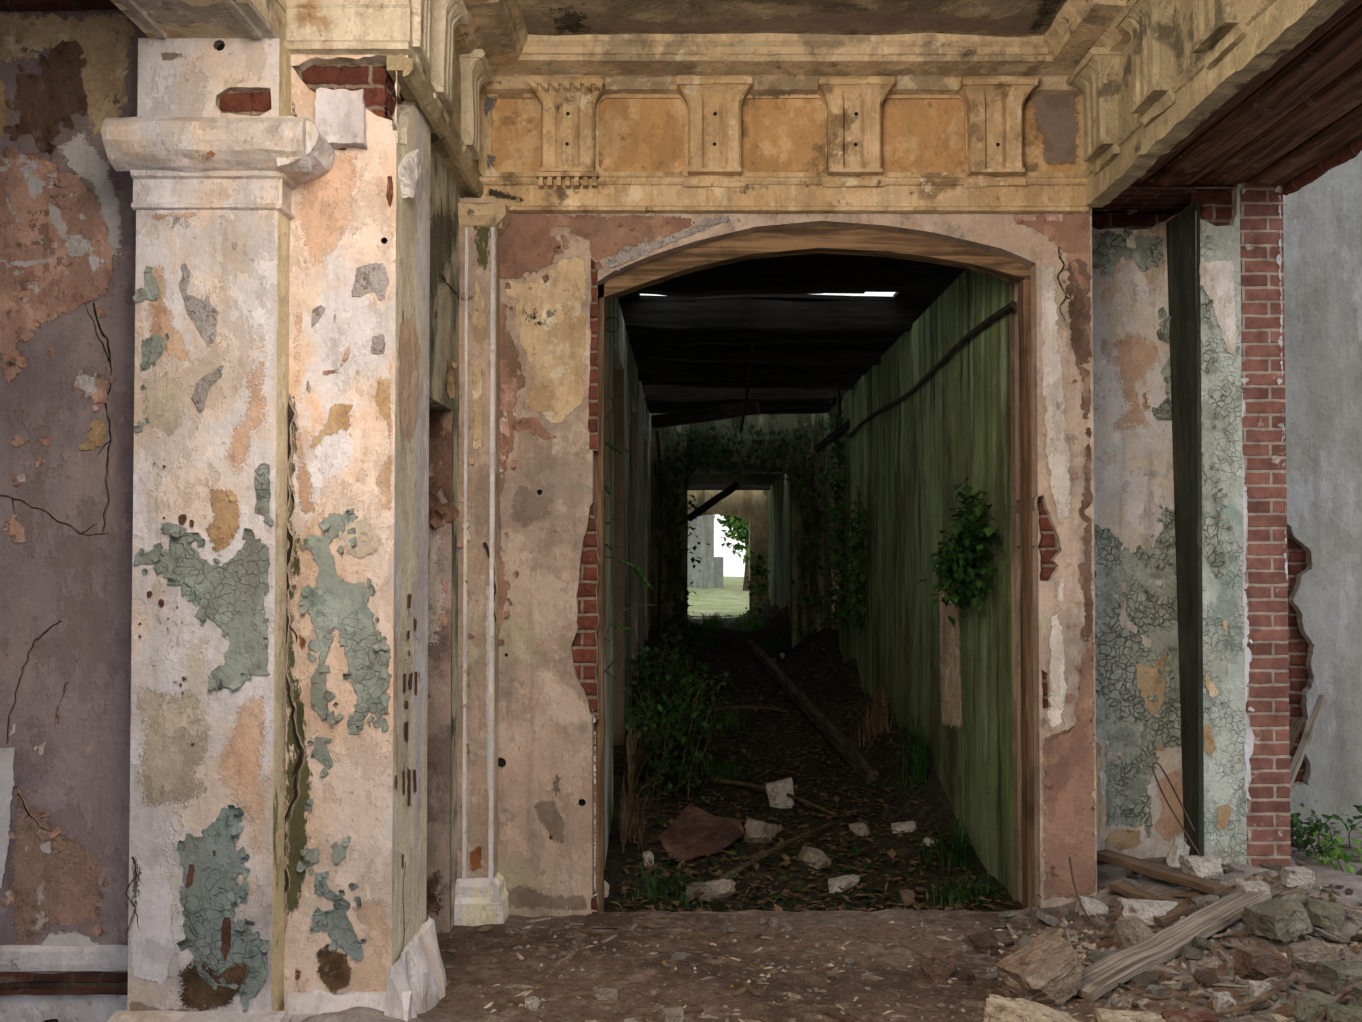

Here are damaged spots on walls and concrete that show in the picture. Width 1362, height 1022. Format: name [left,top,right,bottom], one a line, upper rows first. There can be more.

peeling [0,11,136,383]
crack [0,292,114,536]
peeling [71,368,115,450]
peeling [133,265,191,436]
peeling [130,332,274,1010]
peeling [323,346,350,375]
peeling [296,403,418,776]
peeling [374,213,740,646]
spalling [571,500,599,719]
peeling [1013,188,1246,900]
spalling [1287,524,1315,787]
peeling [0,724,108,946]